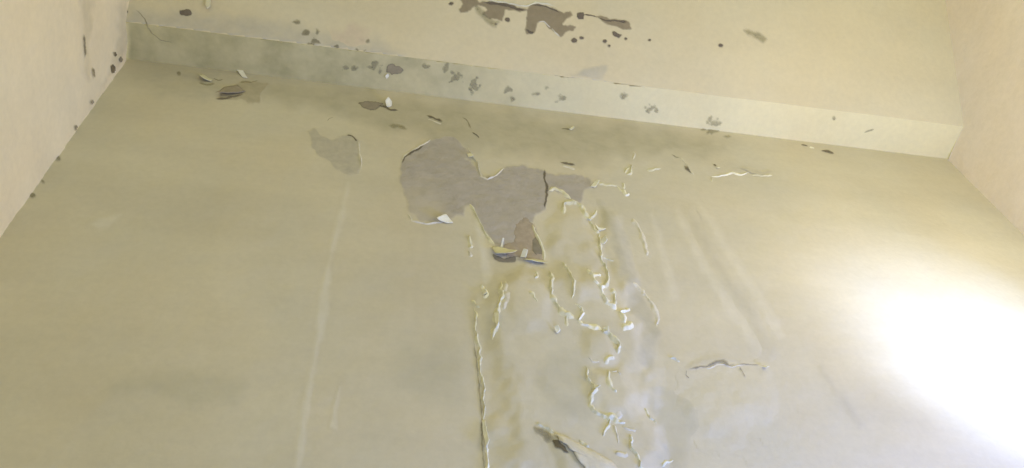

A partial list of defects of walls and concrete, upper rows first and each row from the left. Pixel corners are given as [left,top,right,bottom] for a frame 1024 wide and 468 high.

peeling [449,0,633,47]
peeling [198,70,269,106]
peeling [359,97,396,111]
peeling [307,128,363,177]
peeling [398,136,644,468]
leakage [671,198,789,366]
leakage [596,198,699,468]